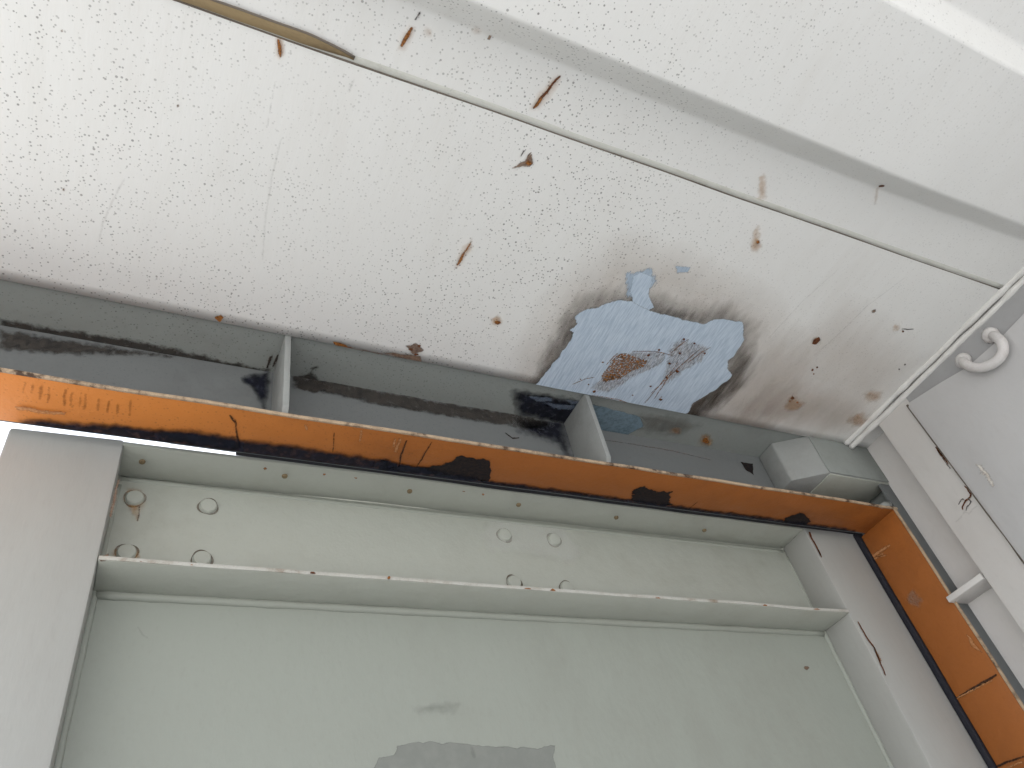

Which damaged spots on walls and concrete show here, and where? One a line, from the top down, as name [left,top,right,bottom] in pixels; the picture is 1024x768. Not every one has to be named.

rust [533,76,561,109]
rust [602,349,660,382]
peeling [415,455,492,481]
crack [935,447,972,510]
peeling [631,486,673,505]